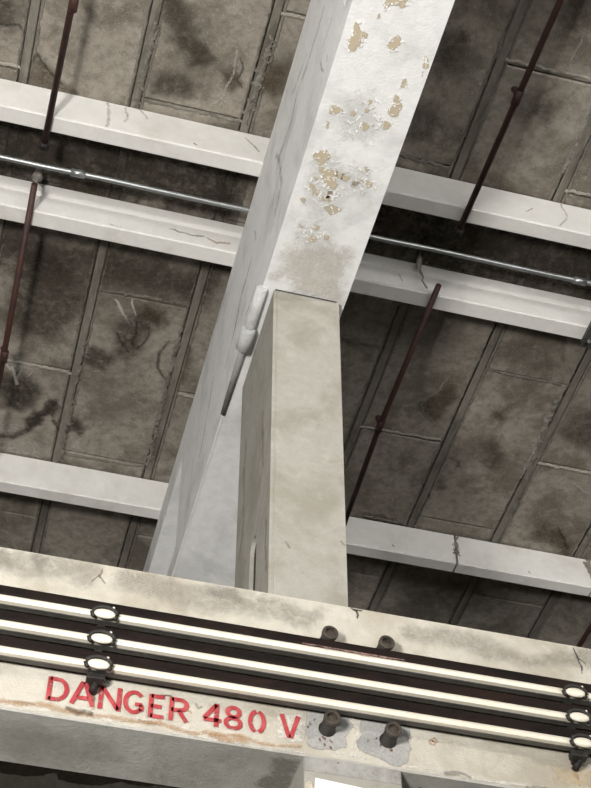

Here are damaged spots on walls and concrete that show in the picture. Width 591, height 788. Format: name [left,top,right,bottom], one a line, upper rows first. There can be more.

peeling [377,0,413,19]
peeling [344,21,368,52]
peeling [387,34,405,52]
peeling [387,78,408,117]
peeling [326,104,346,128]
peeling [312,148,342,215]
damp [83,299,160,372]
damp [0,359,86,458]
rust [4,695,100,717]